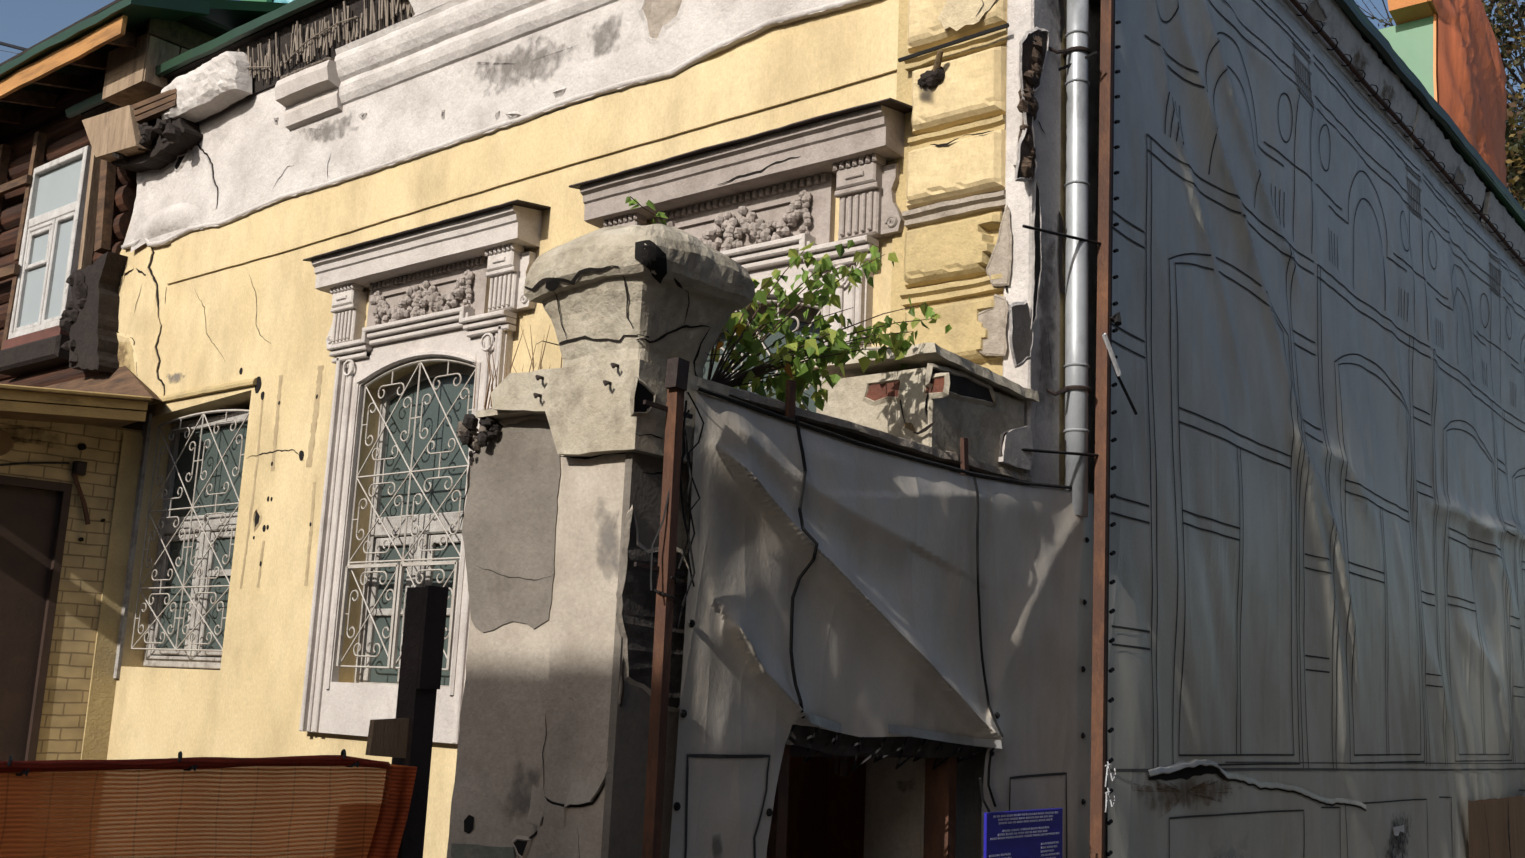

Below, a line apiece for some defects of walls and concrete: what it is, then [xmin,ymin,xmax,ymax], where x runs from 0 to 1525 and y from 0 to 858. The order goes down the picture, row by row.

peeling [639,0,687,45]
peeling [938,0,995,31]
crack [717,156,800,185]
crack [117,246,225,396]
crack [525,265,735,377]
crack [527,648,625,858]